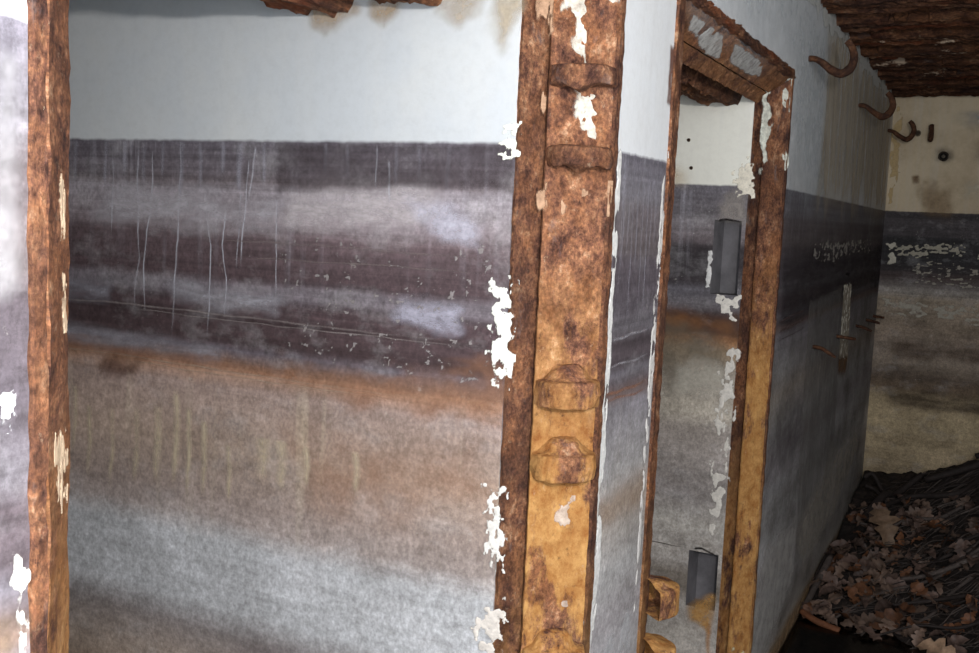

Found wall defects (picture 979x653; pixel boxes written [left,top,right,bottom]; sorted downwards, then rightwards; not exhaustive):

peeling [813,239,871,262]
peeling [886,242,979,289]
peeling [0,393,16,419]
peeling [709,348,741,535]
peeling [481,483,508,574]
peeling [470,597,509,653]